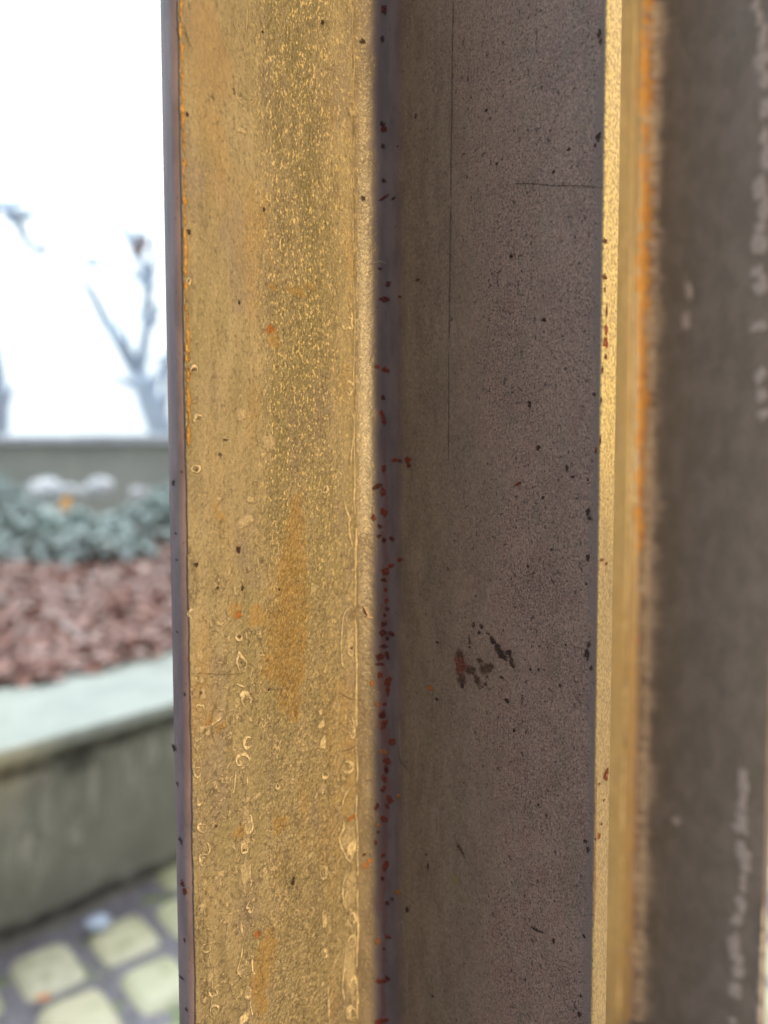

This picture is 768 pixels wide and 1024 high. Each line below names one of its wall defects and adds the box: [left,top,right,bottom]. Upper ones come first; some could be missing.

corrosion [178,0,241,448]
corrosion [361,394,413,1024]